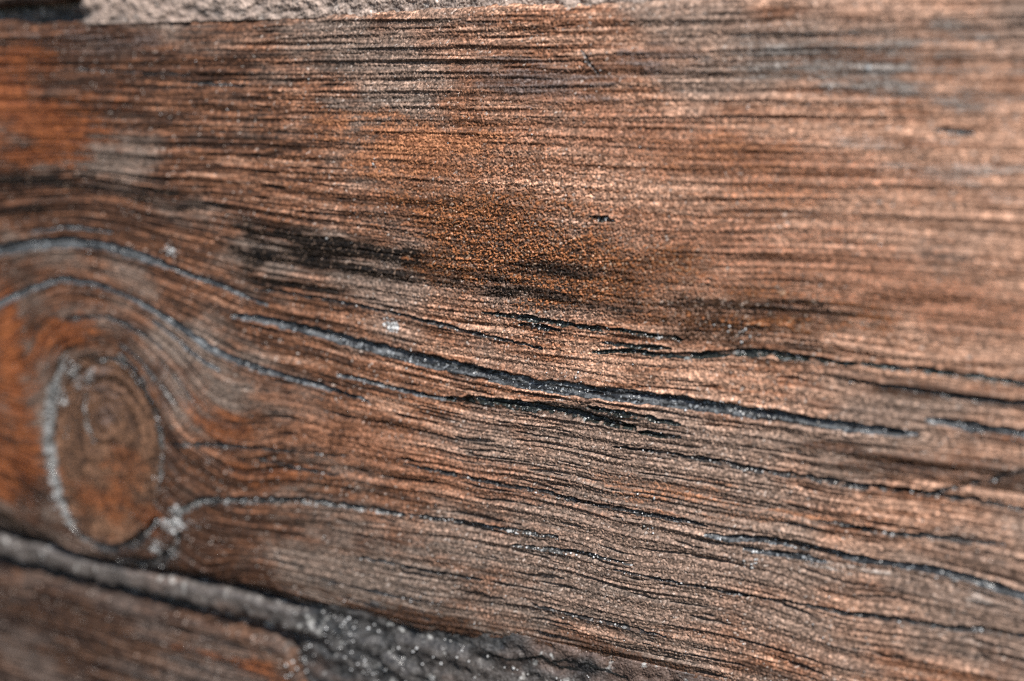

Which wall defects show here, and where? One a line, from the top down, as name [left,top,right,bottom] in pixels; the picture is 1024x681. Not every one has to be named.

crack [0,224,1024,512]
crack [167,441,1024,639]